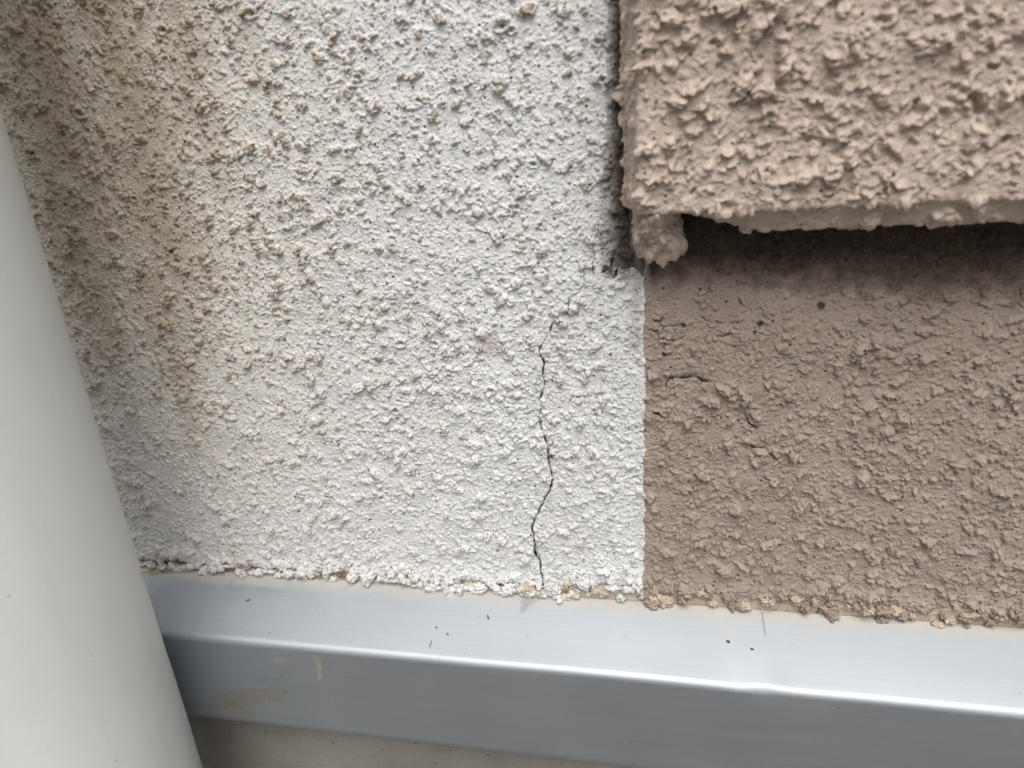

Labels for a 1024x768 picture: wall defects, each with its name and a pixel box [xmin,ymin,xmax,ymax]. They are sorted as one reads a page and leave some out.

crack [520,225,619,586]